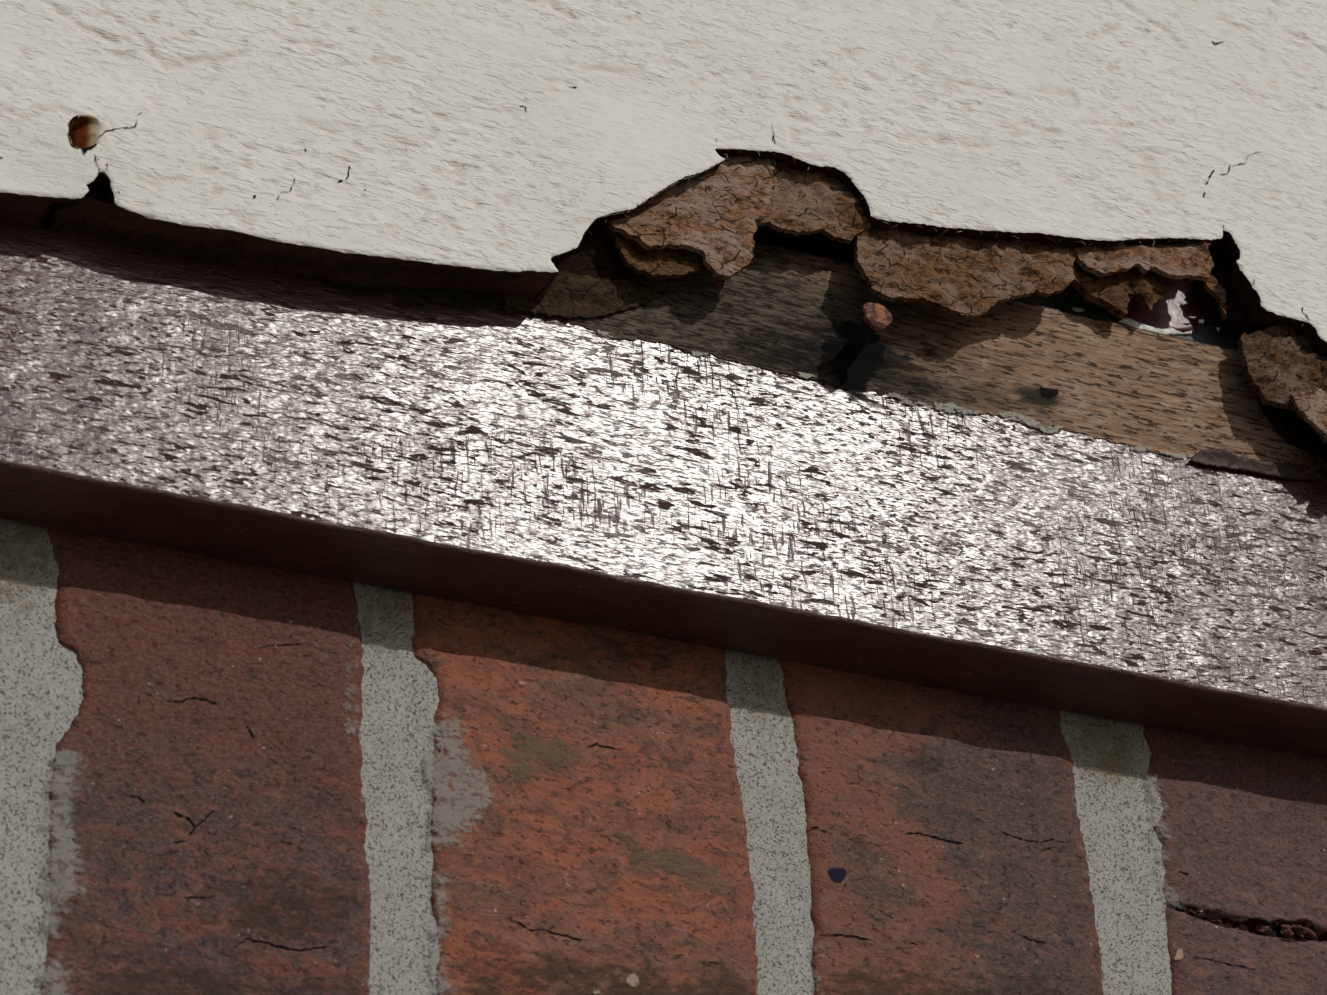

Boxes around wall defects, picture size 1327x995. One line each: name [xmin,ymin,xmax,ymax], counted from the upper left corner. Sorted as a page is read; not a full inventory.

corrosion [69,115,97,153]
spalling [500,149,1327,483]
crack [1173,871,1327,941]